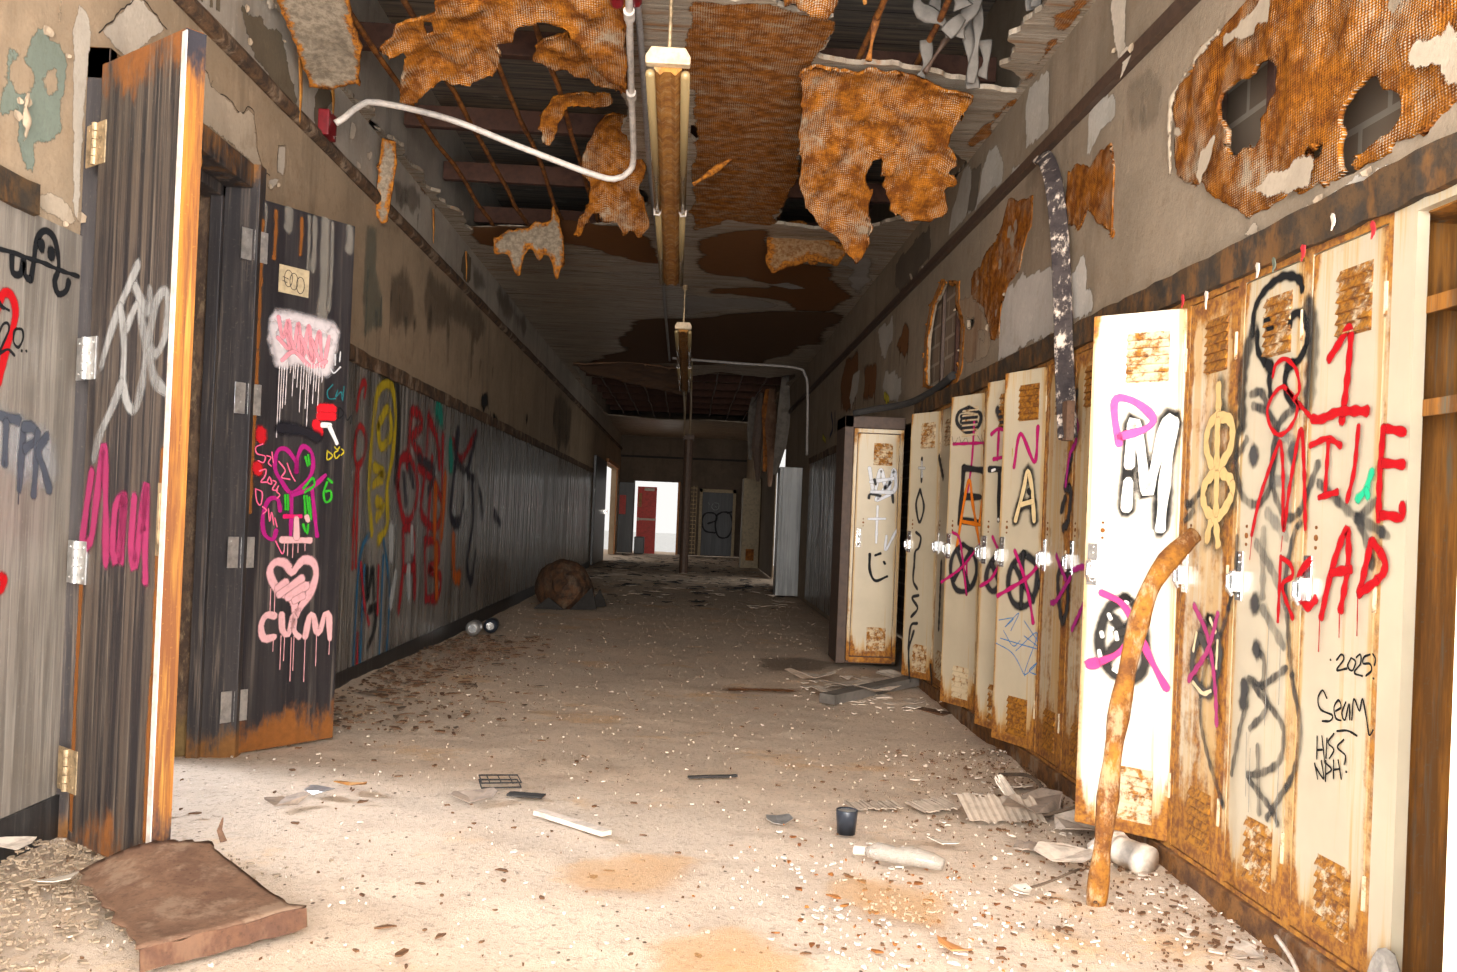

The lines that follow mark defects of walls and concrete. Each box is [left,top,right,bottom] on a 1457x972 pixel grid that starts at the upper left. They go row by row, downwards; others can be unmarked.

peeling [241,0,297,103]
peeling [1111,0,1133,78]
peeling [0,0,163,227]
peeling [314,88,332,127]
peeling [949,71,1049,235]
peeling [1087,94,1115,154]
flaking render [1307,164,1387,206]
peeling [461,252,471,283]